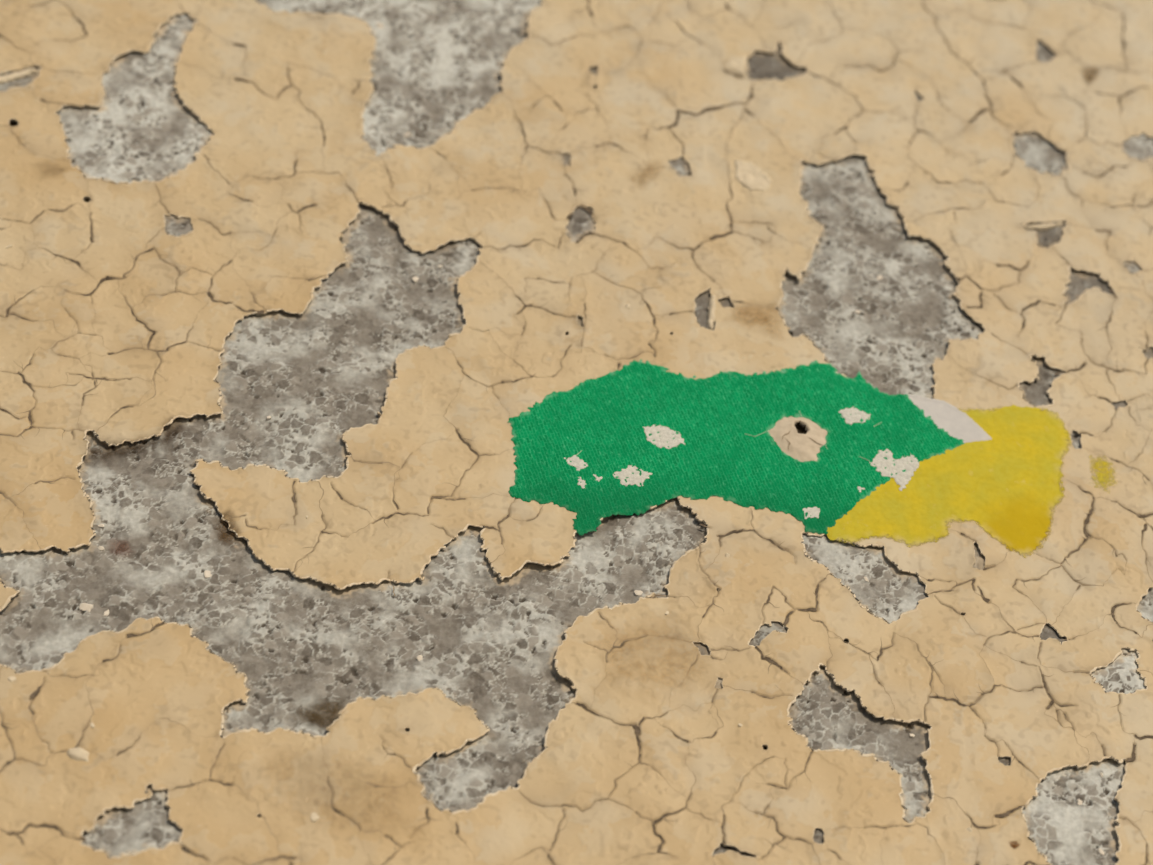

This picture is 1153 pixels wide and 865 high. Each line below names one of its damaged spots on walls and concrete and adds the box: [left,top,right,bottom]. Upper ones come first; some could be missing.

peeling [55,12,215,184]
peeling [255,0,544,156]
peeling [1011,130,1070,177]
crack [0,0,1153,572]
peeling [693,287,735,331]
peeling [775,153,986,399]
peeling [0,201,711,814]
peeling [800,531,929,624]
peeling [80,783,183,859]
crack [511,479,1153,865]
peeling [787,663,934,824]
peeling [1020,756,1128,865]